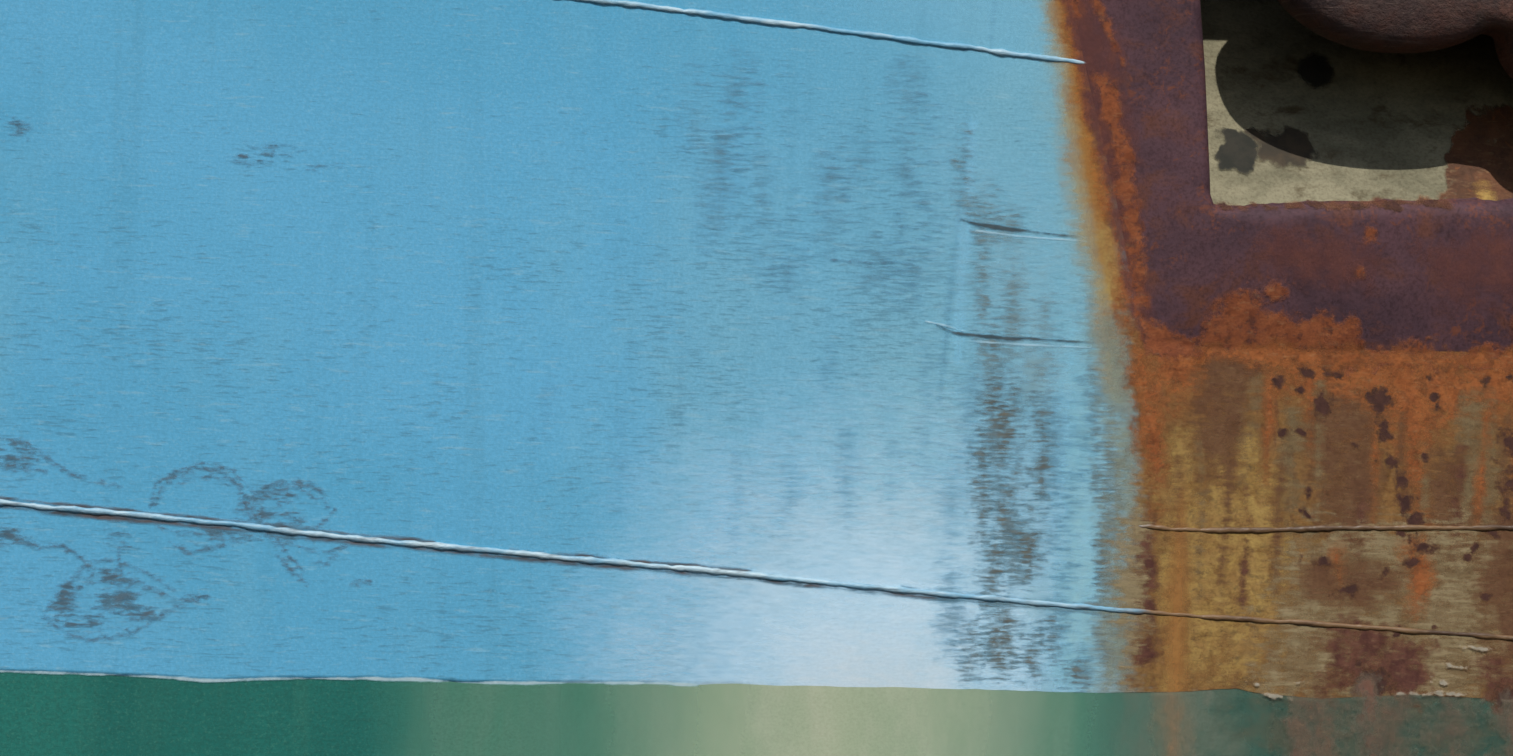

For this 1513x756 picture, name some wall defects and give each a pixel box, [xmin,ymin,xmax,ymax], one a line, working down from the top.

peeling [1296,52,1335,89]
peeling [1214,125,1319,175]
rust [1046,0,1513,756]
leakage [0,149,1138,756]
leakage [1121,687,1513,756]